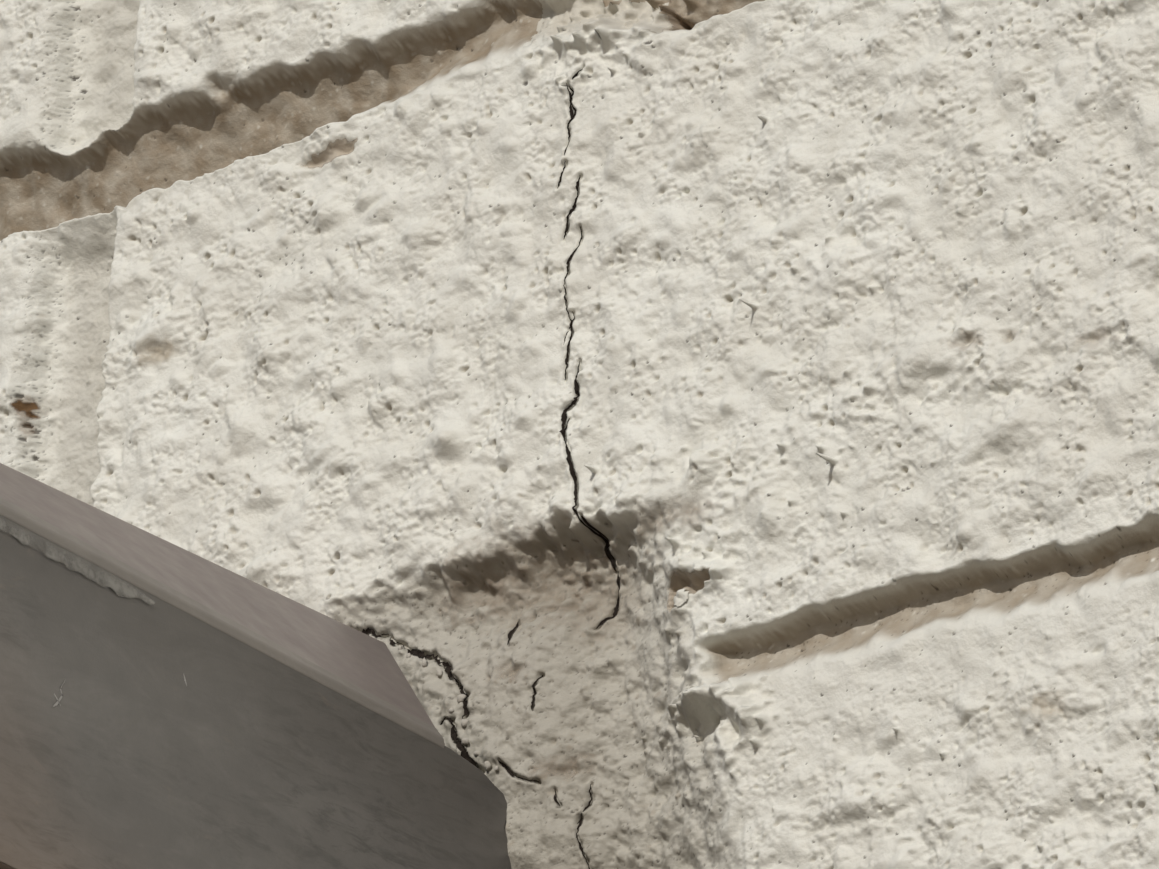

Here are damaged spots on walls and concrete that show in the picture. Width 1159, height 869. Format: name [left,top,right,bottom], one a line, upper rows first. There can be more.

crack [558,69,620,629]
crack [358,628,592,869]
crack [507,621,519,645]